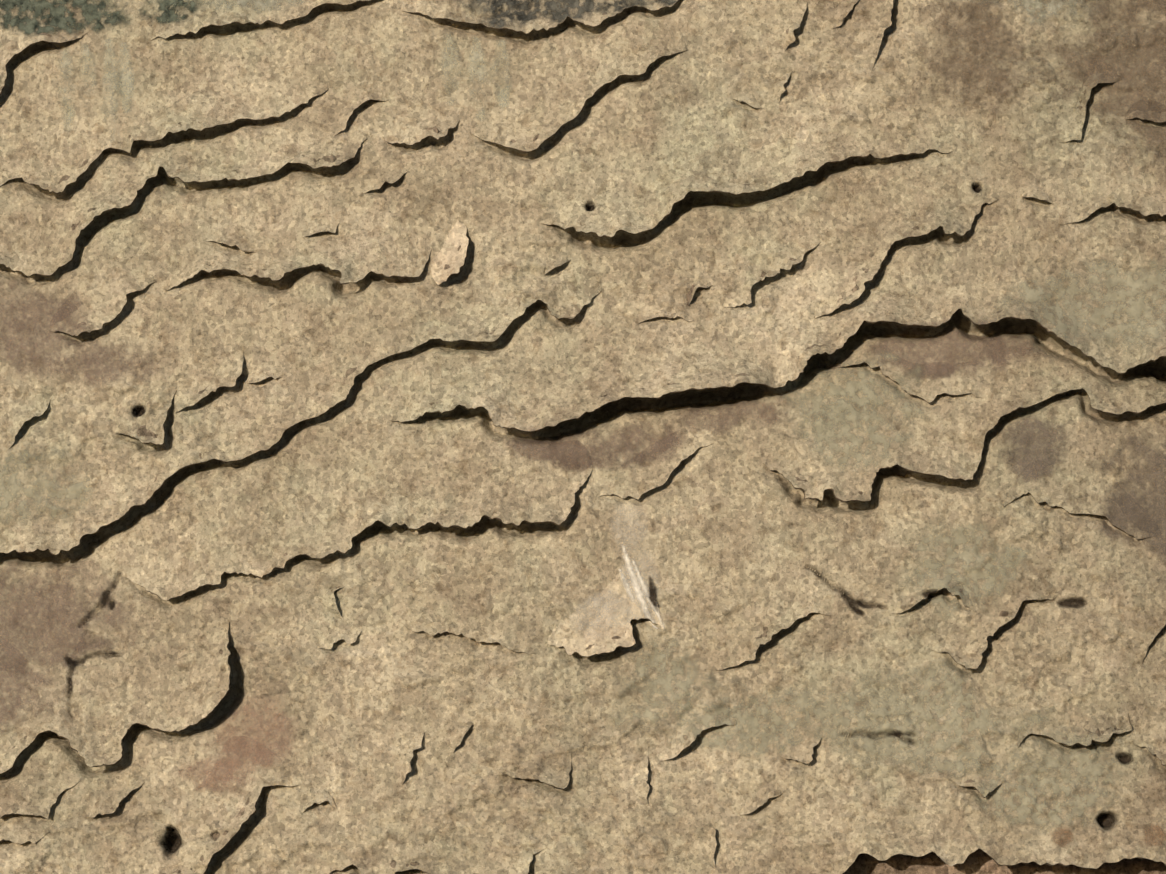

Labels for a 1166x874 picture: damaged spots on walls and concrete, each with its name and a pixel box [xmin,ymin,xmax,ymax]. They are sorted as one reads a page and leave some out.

flaking render [0,0,1166,556]
crack [83,584,116,625]
flaking render [0,436,593,774]
flaking render [402,567,664,657]
flaking render [716,569,835,670]
crack [811,569,880,614]
flaking render [892,542,1060,670]
flaking render [1016,687,1166,766]
spalling [0,765,80,844]
spalling [85,768,145,818]
flaking render [112,741,300,874]
flaking render [301,787,546,874]